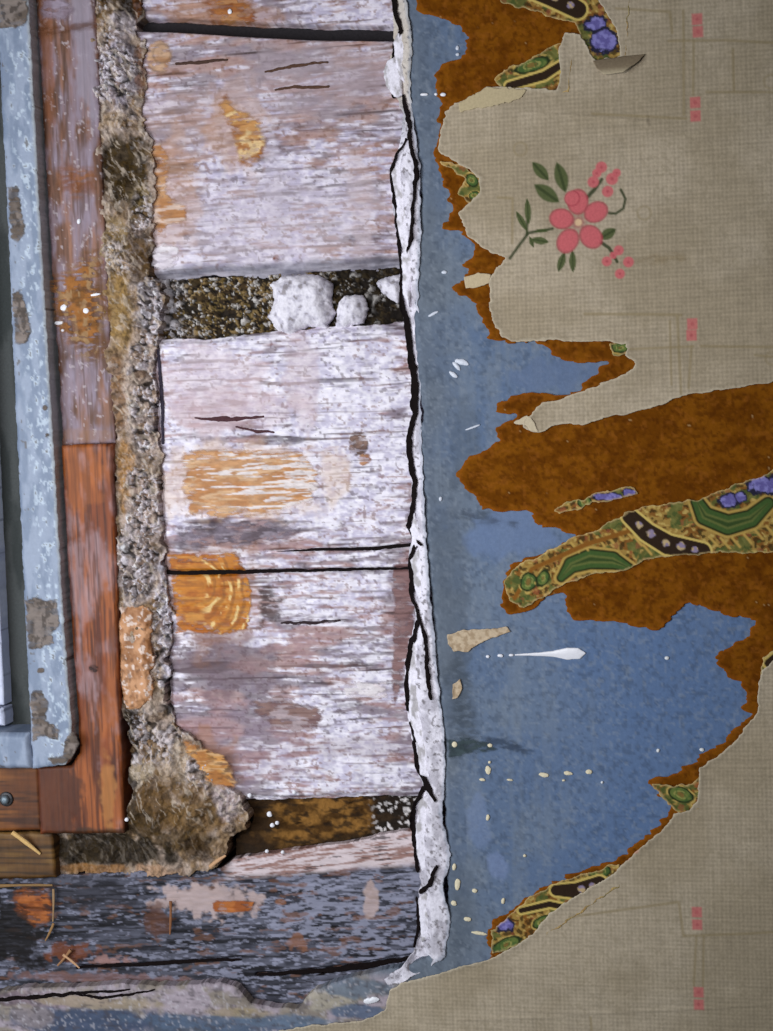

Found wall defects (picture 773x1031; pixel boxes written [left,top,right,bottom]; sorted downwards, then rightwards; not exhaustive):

peeling [0,0,28,28]
crack [143,0,402,91]
peeling [459,87,526,112]
peeling [464,273,491,288]
peeling [514,416,538,432]
crack [0,94,438,1002]
peeling [25,598,60,649]